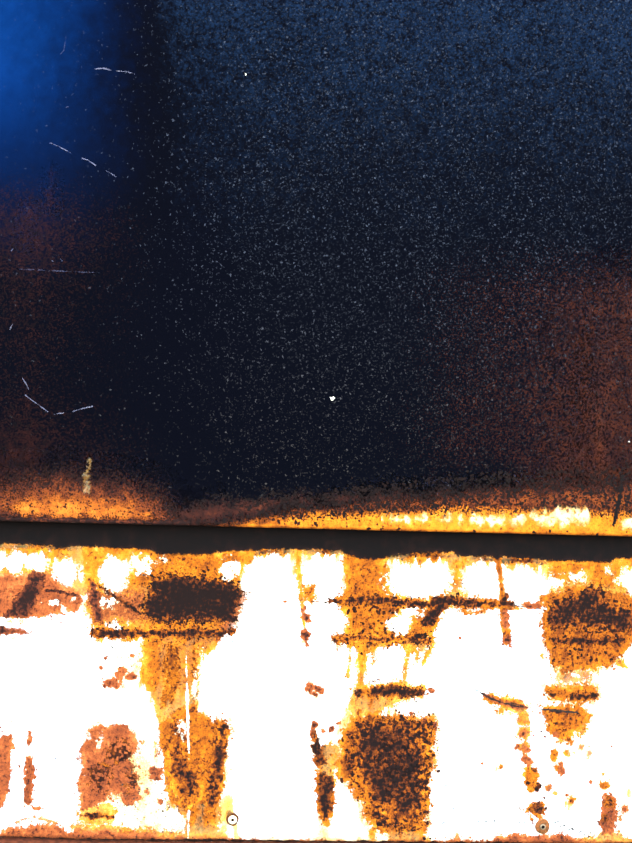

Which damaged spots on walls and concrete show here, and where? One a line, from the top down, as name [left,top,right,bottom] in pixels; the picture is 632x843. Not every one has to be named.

corrosion [0,458,632,843]